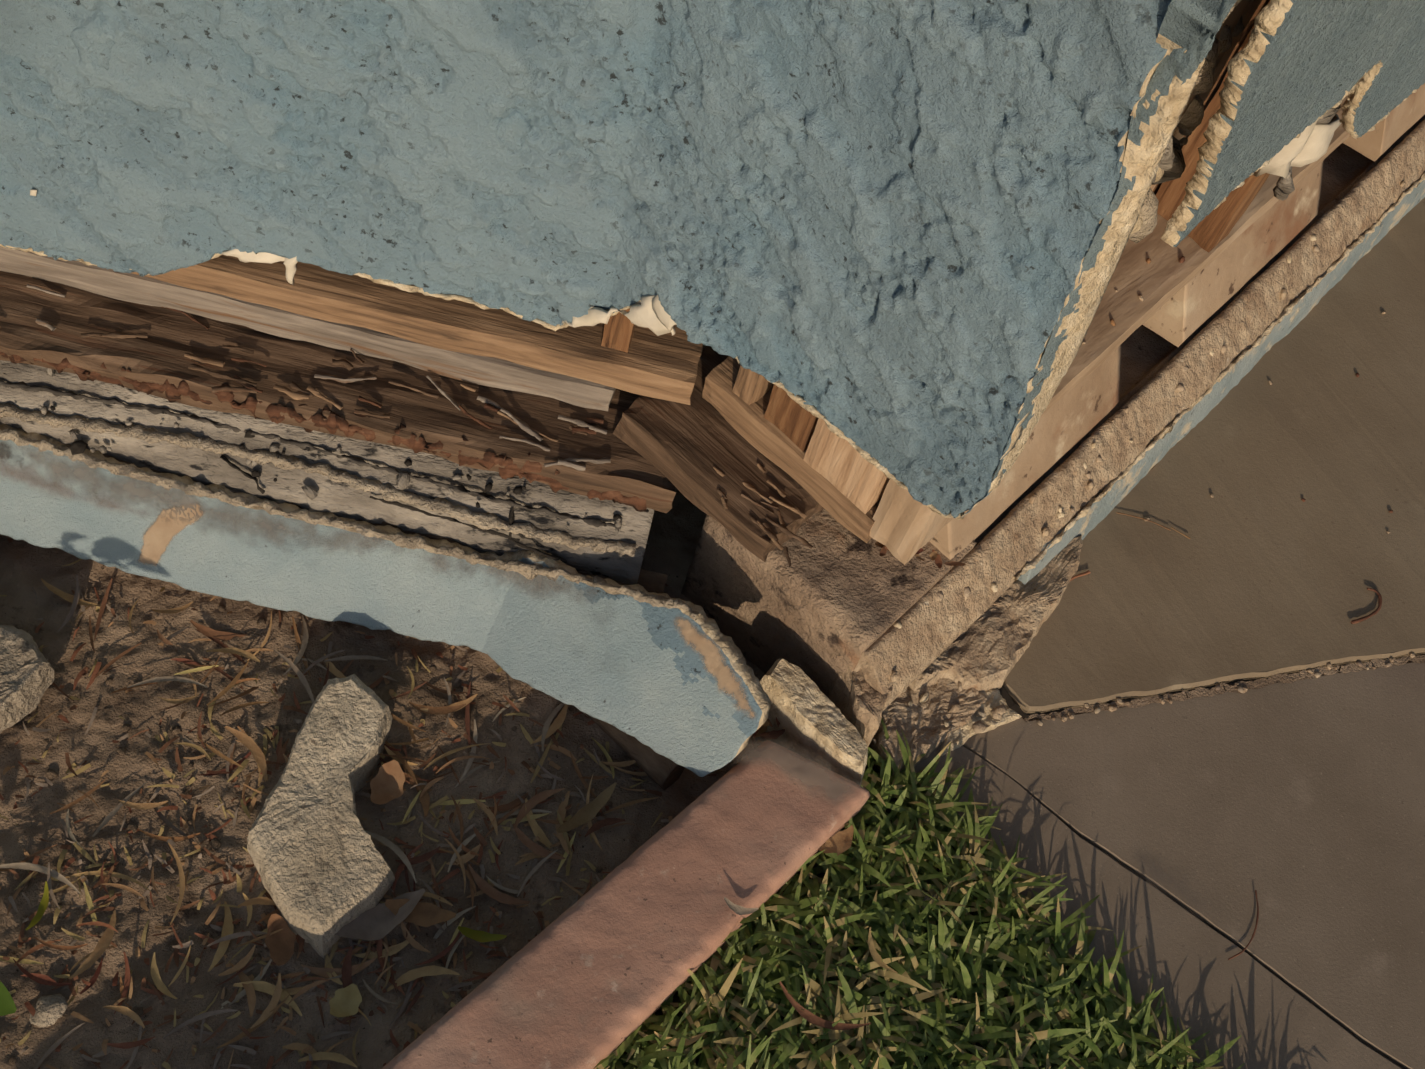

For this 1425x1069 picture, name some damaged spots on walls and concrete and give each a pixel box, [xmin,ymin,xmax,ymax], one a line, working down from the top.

spalling [1214,60,1417,210]
spalling [0,244,97,266]
spalling [211,249,298,285]
spalling [354,273,685,336]
spalling [926,0,1245,520]
spalling [766,379,908,490]
spalling [858,119,1425,710]
spalling [0,368,754,717]
crack [998,655,1425,723]